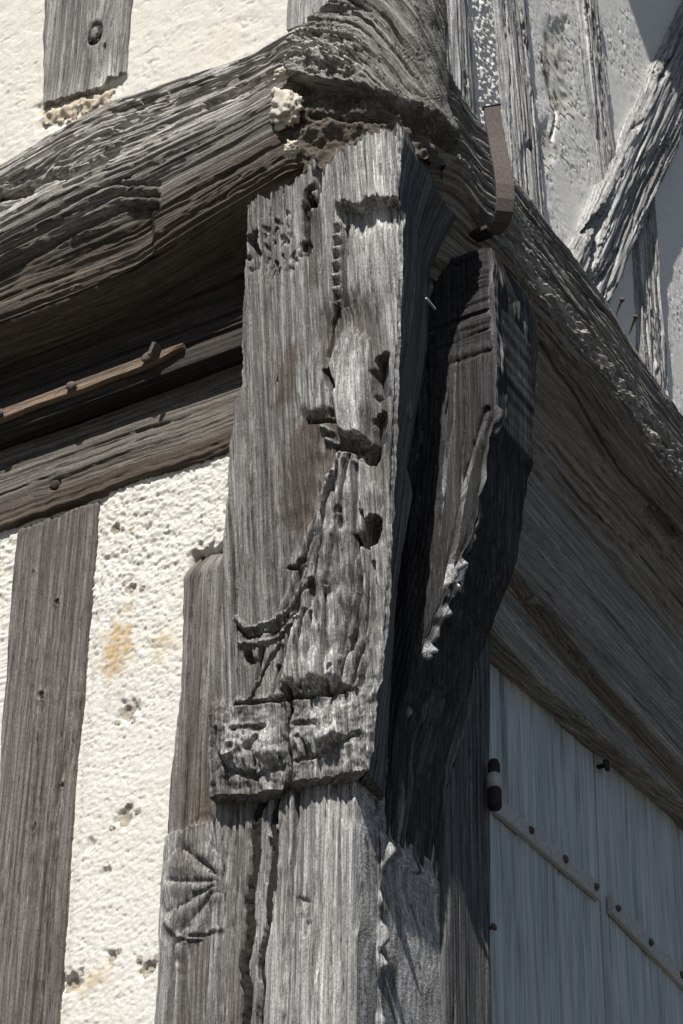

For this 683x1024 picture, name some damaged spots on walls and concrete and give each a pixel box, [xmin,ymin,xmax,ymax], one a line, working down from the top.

leakage [102,602,132,676]
flaking render [109,802,141,830]
crack [240,693,295,1024]
flaking render [136,953,159,978]
flaking render [65,970,84,993]